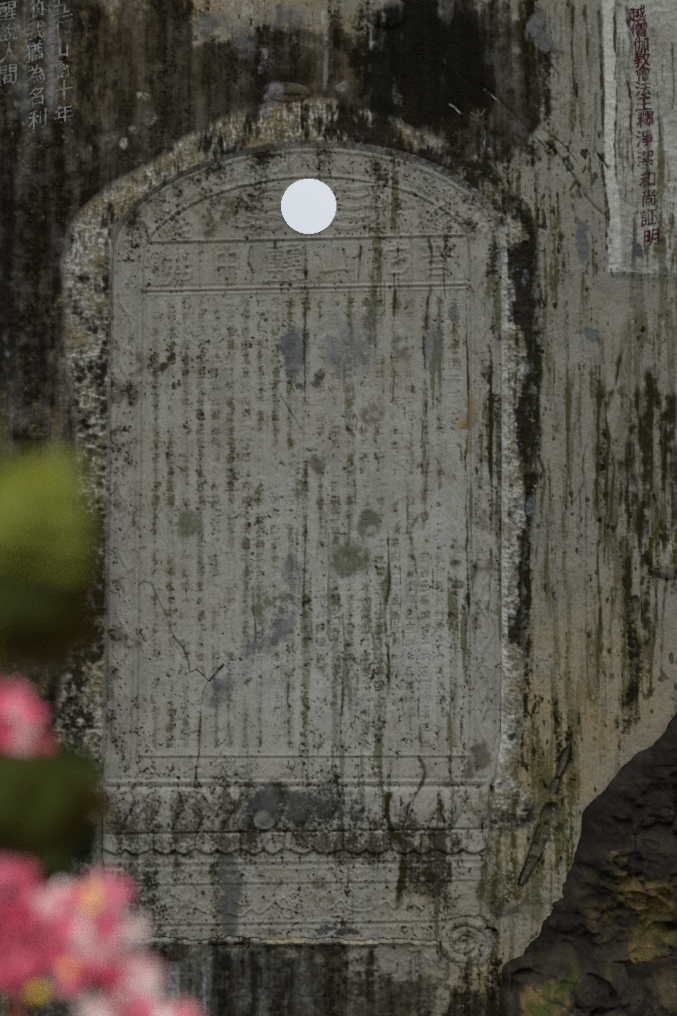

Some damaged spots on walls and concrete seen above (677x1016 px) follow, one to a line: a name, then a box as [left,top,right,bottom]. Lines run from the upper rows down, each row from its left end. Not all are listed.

leakage [339,0,496,120]
leakage [571,6,600,89]
leakage [514,298,570,526]
leakage [579,354,677,695]
leakage [521,540,537,718]
leakage [197,941,262,1016]